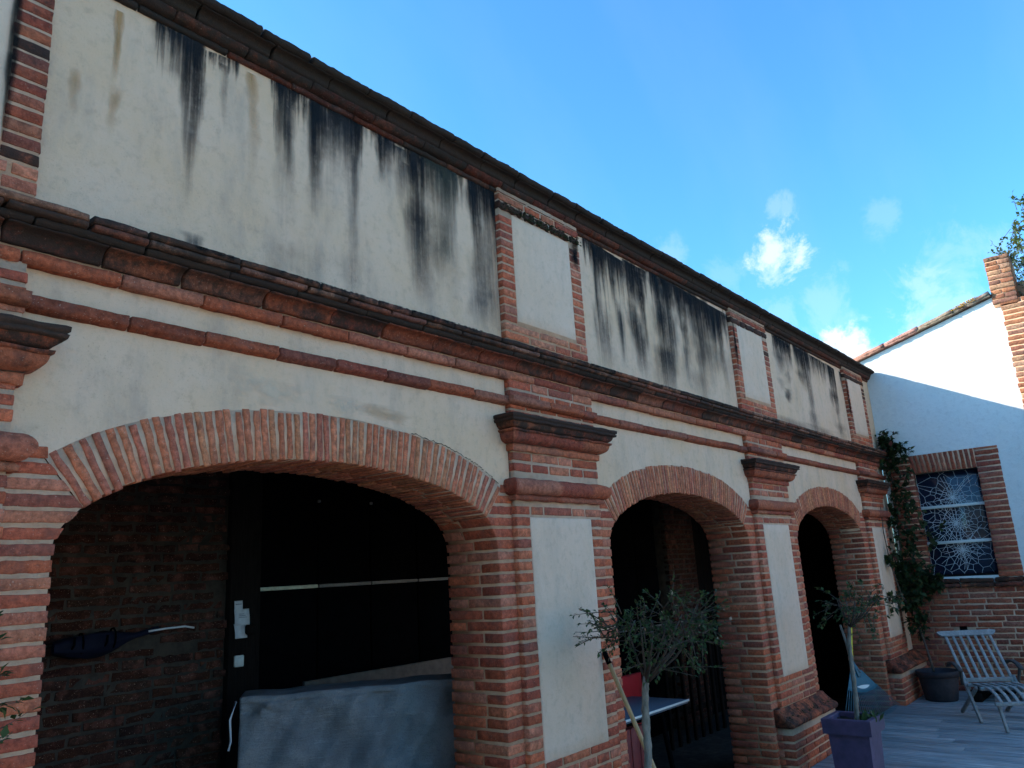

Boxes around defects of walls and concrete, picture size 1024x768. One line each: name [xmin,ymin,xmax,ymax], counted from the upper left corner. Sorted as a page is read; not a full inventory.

leakage [156,21,253,114]
leakage [271,79,495,222]
leakage [572,238,738,354]
leakage [772,336,850,403]